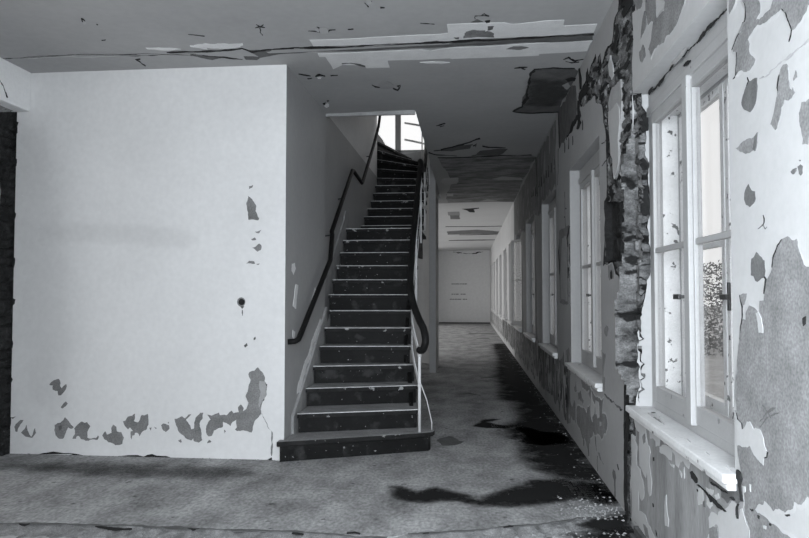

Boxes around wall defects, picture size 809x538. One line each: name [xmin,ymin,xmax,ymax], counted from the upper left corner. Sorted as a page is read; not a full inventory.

crack [3,48,294,66]
peeling [246,185,259,220]
flaking render [0,111,36,456]
peeling [438,0,809,538]
peeling [49,379,68,408]
peeling [54,366,269,445]